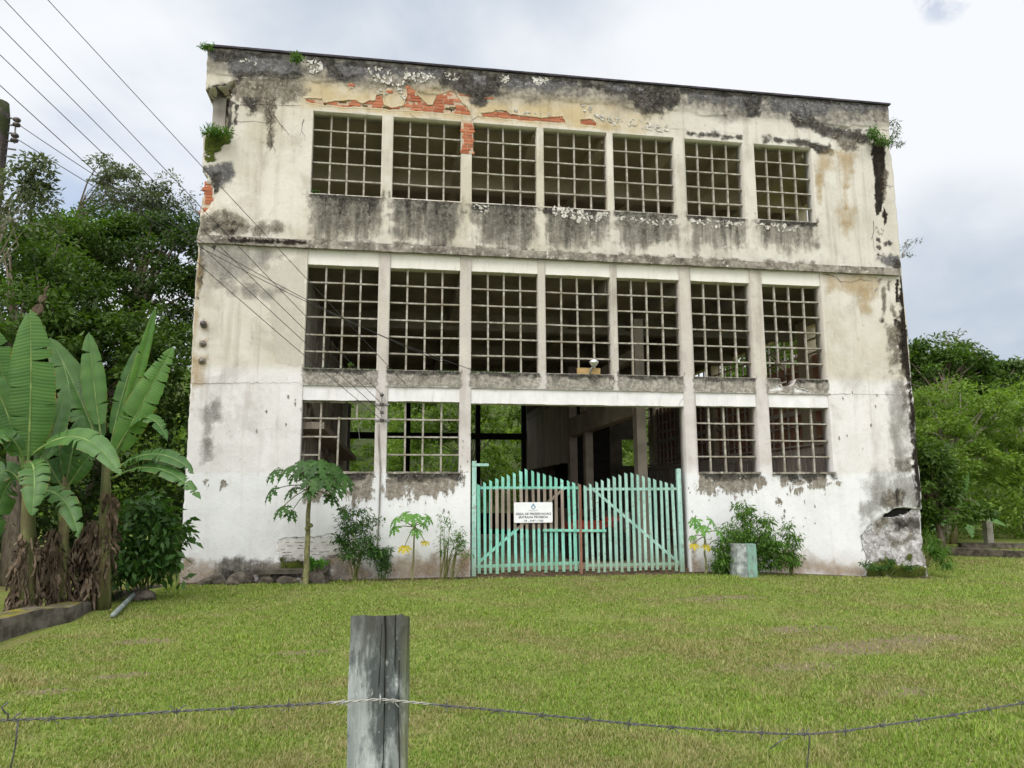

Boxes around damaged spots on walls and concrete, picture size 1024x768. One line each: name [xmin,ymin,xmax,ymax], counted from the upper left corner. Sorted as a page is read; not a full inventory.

flaking render [302,66,669,155]
water stain [207,48,889,225]
flaking render [199,181,214,214]
water stain [199,192,819,264]
water stain [876,238,921,509]
water stain [204,402,220,455]
peeling [295,433,471,507]
flaking render [860,508,928,577]